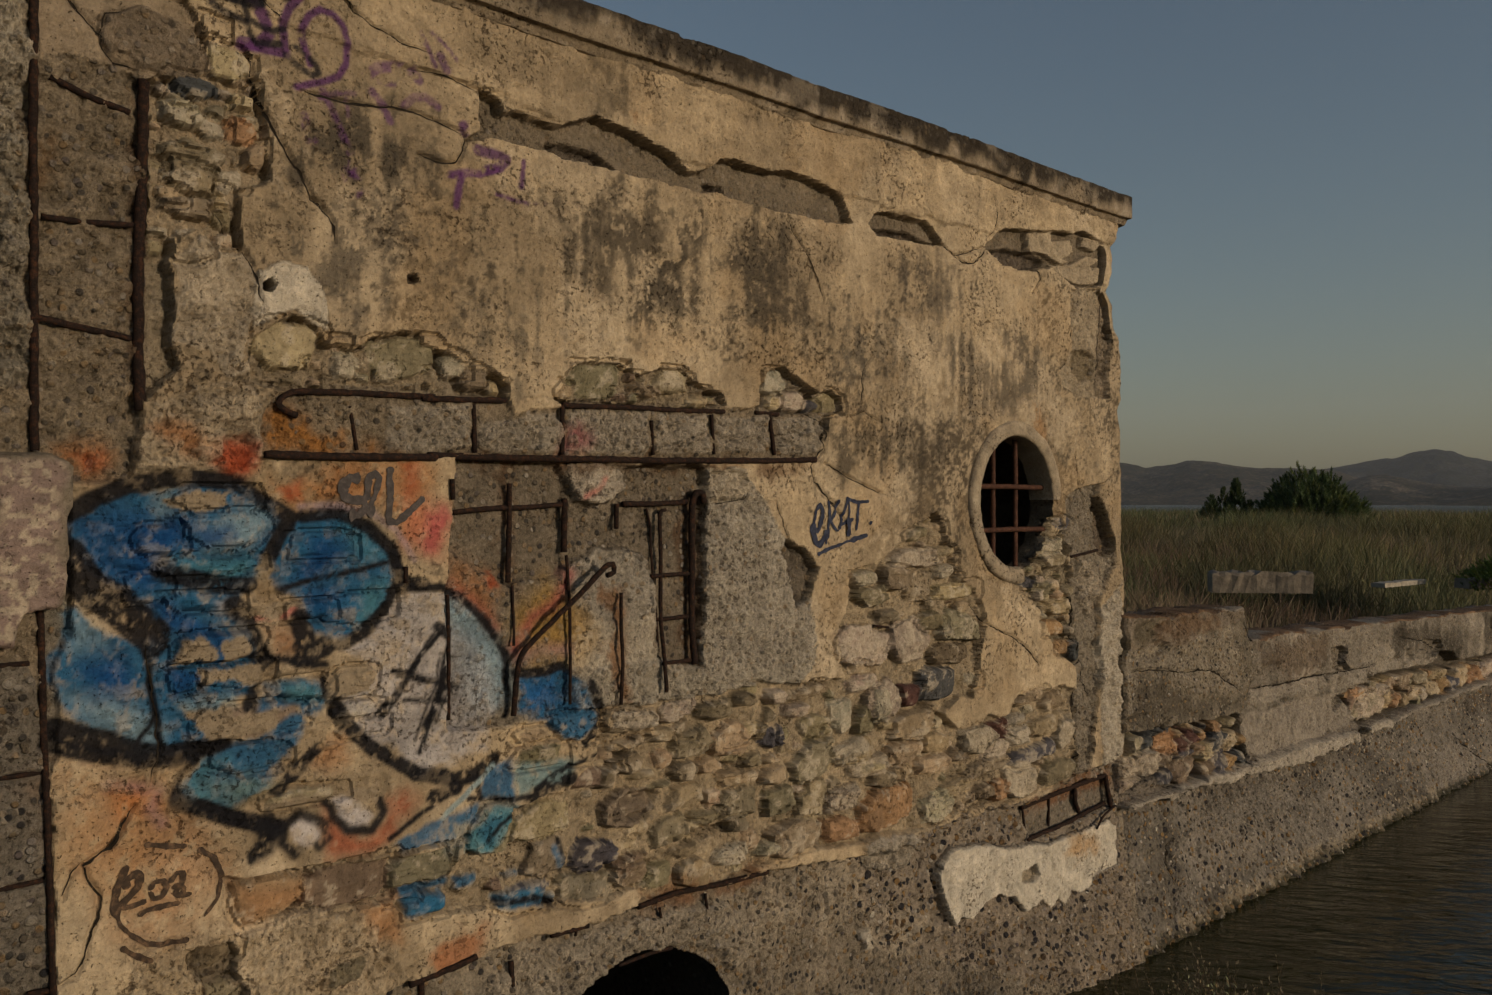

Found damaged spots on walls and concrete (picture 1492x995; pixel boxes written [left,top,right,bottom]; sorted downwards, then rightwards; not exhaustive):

crack [68,0,133,69]
corrosion [27,0,150,451]
spalling [0,0,254,482]
crack [213,213,264,302]
damp [277,55,1050,495]
crack [943,205,998,264]
flaking render [386,847,451,888]
corrosion [260,388,817,716]
spalling [274,388,830,728]
spalling [527,483,1146,995]
corrosion [1019,763,1116,862]
spalling [1367,638,1492,677]